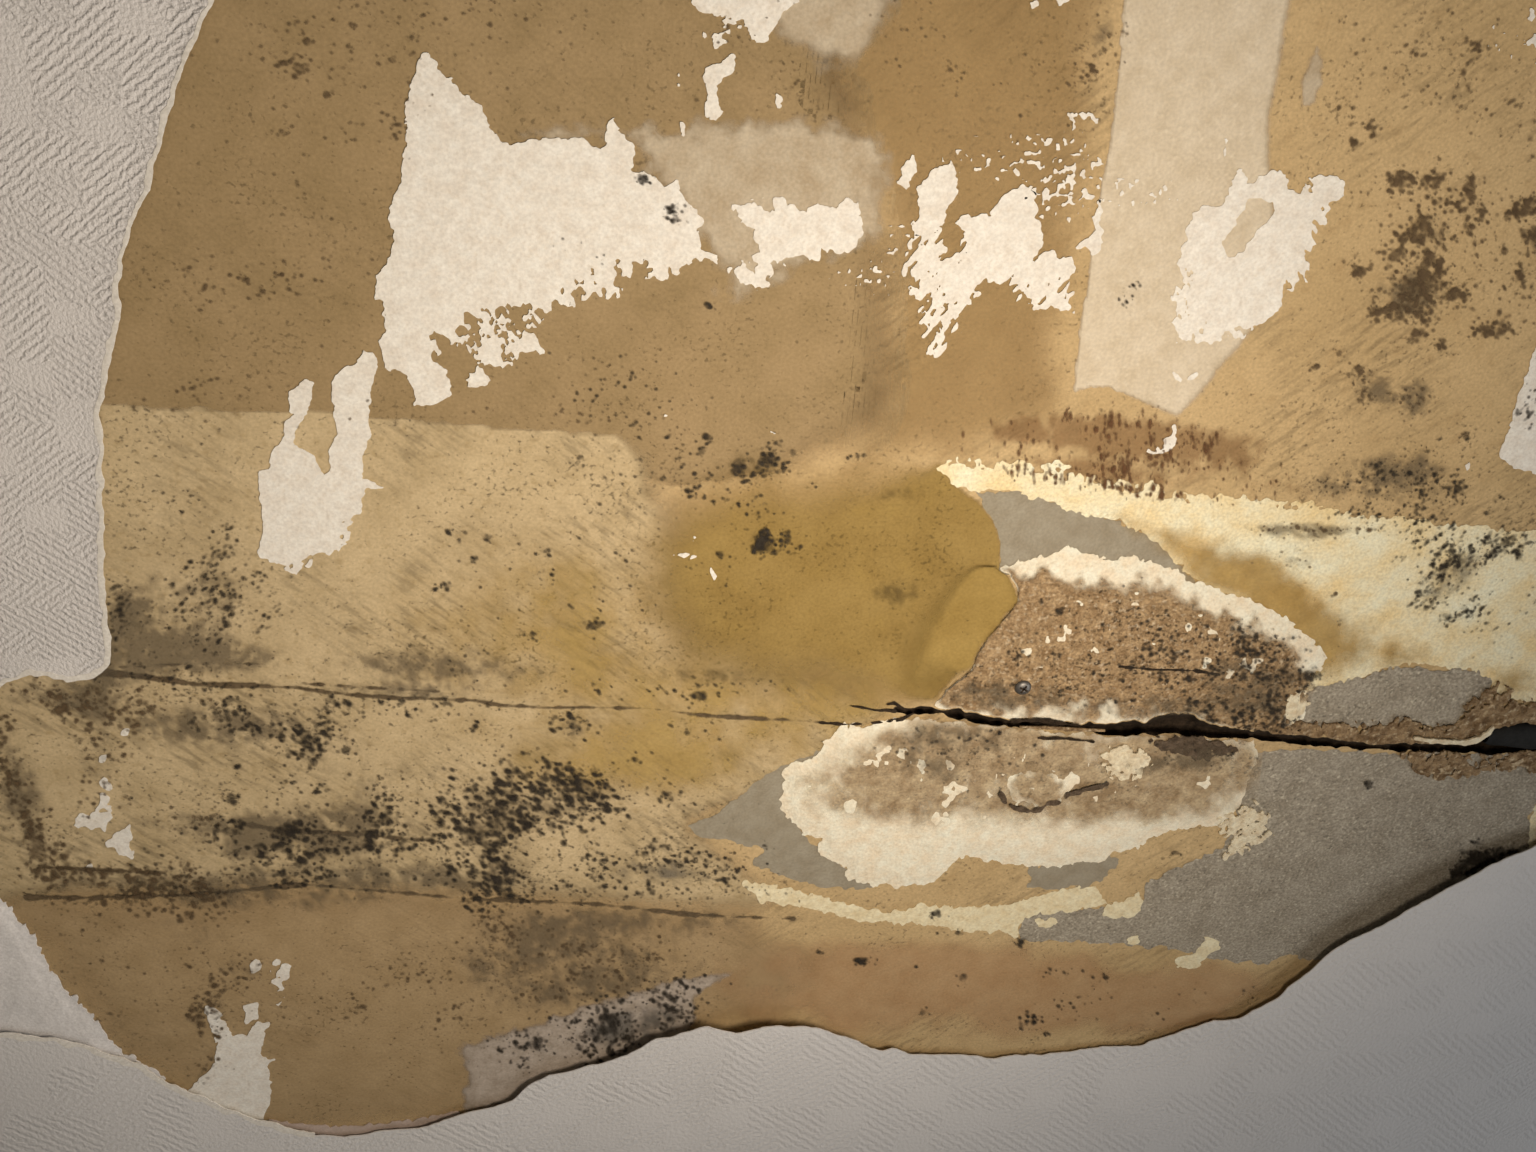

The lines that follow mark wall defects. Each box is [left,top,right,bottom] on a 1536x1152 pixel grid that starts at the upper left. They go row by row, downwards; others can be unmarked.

peeling [691,0,799,121]
leakage [100,0,1030,732]
peeling [257,52,1178,580]
peeling [1170,138,1345,345]
leakage [1351,159,1536,354]
crack [104,663,631,710]
leakage [0,526,1253,1120]
crack [688,701,1536,755]
flaking render [779,545,1536,889]
crack [1118,665,1220,676]
leakage [1040,536,1358,759]
peeling [463,974,727,1110]